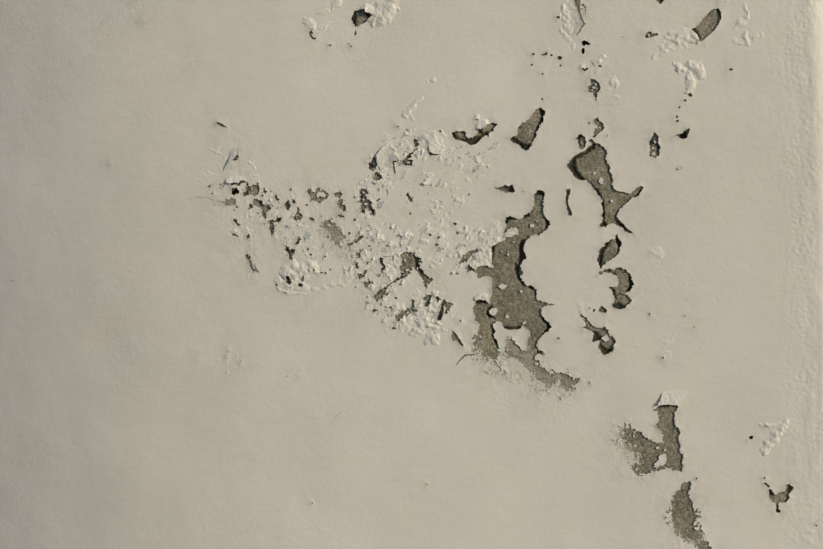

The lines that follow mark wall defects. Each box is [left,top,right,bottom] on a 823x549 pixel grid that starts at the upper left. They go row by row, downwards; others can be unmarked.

peeling [691,8,721,41]
peeling [510,98,545,151]
peeling [208,119,590,400]
peeling [567,118,644,355]
peeling [613,389,691,476]
peeling [666,477,712,549]
peeling [763,477,794,513]